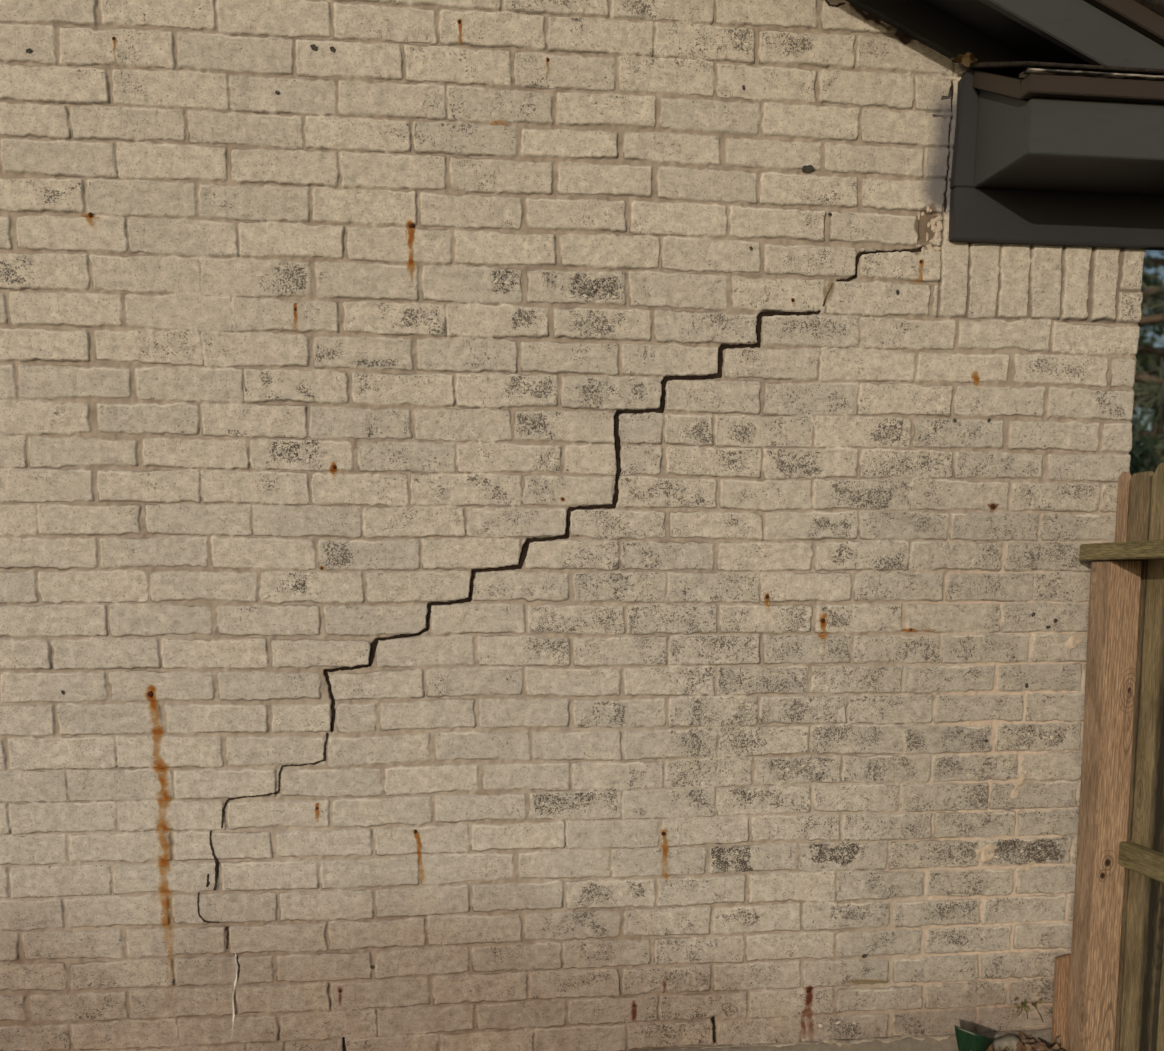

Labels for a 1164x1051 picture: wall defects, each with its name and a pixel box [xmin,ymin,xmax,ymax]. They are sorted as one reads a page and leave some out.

crack [932,81,954,212]
rust [407,220,415,275]
spalling [914,205,943,255]
crack [197,247,922,1031]
rust [819,613,827,639]
rust [146,685,171,929]
rust [413,829,423,881]
rust [801,986,813,1034]